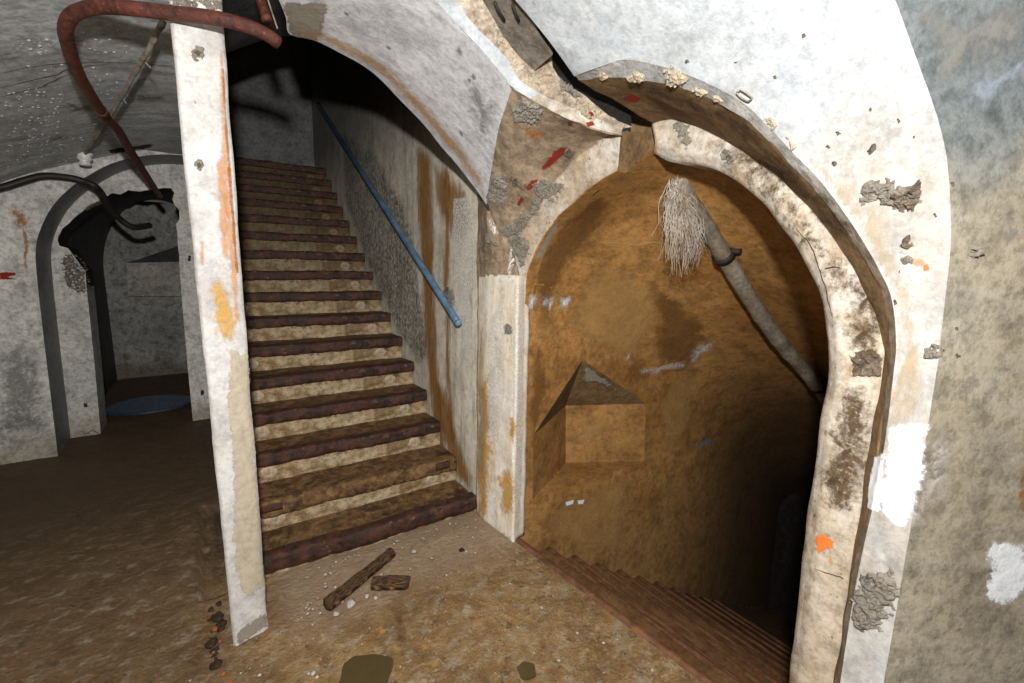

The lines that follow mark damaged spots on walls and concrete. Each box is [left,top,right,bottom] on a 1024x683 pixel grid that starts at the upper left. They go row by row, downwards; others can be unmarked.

spalling [511,96,544,125]
corrosion [218,76,238,293]
spalling [485,168,564,208]
spalling [859,177,922,213]
spalling [61,254,94,294]
corrosion [418,151,467,446]
spalling [850,349,884,377]
spalling [923,344,961,359]
corrosion [477,381,515,516]
spalling [849,567,900,632]